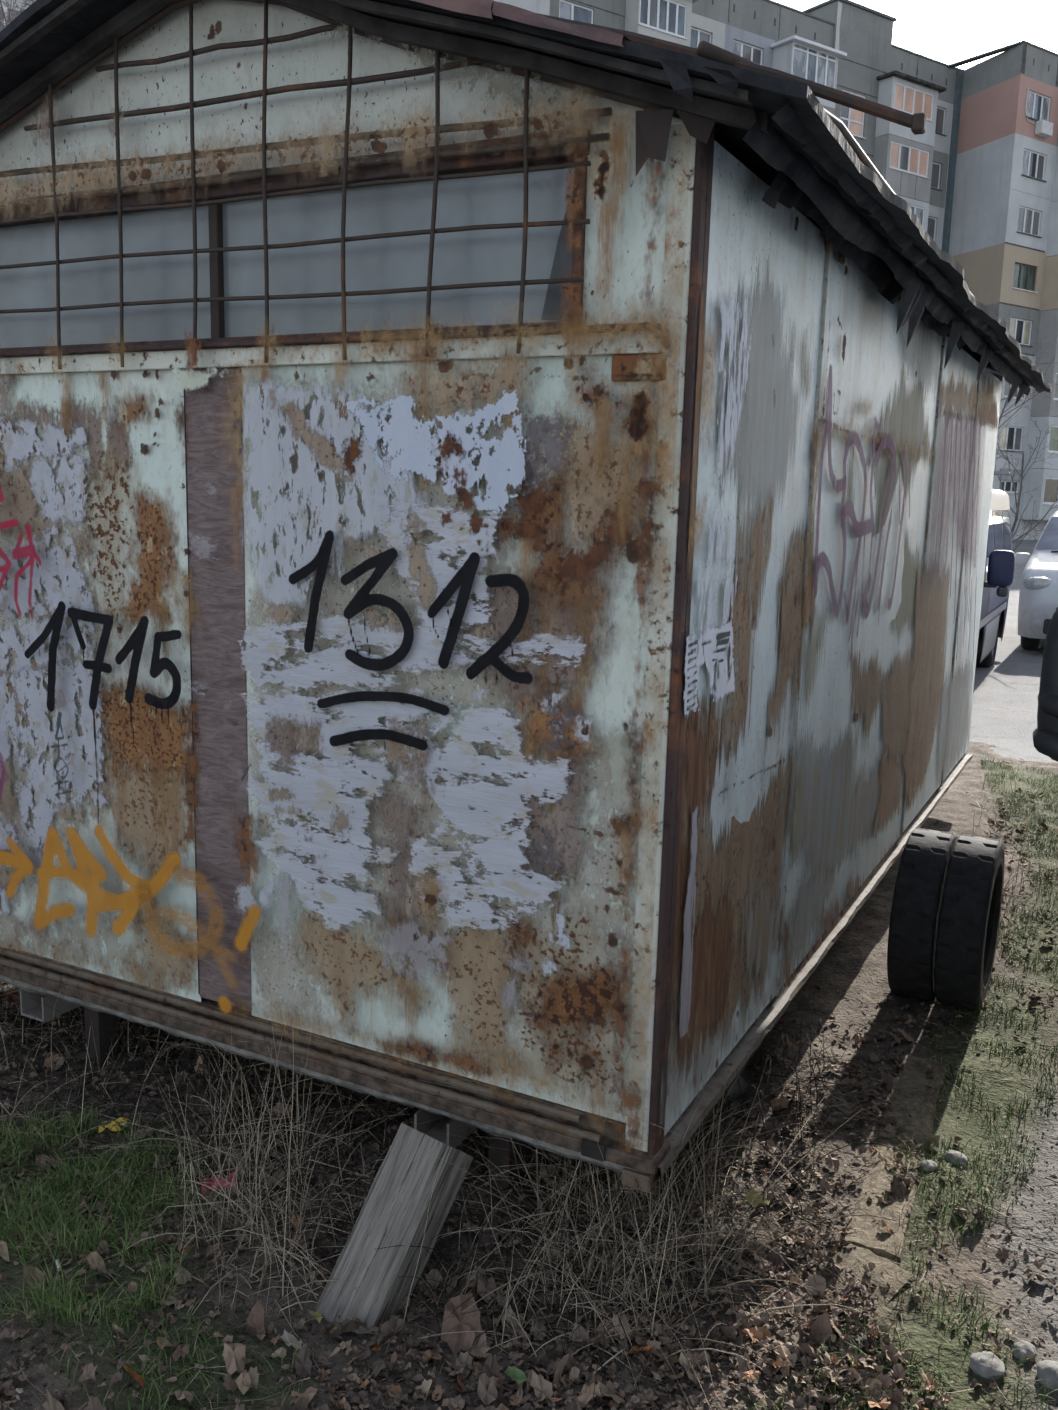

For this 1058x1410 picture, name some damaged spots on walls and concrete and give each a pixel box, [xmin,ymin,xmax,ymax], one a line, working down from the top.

rust [0,93,441,210]
peeling [140,398,164,455]
rust [185,334,202,371]
rust [228,335,276,528]
rust [405,317,527,418]
rust [466,86,681,876]
rust [669,259,998,1086]
rust [97,680,199,874]
rust [272,792,654,1154]